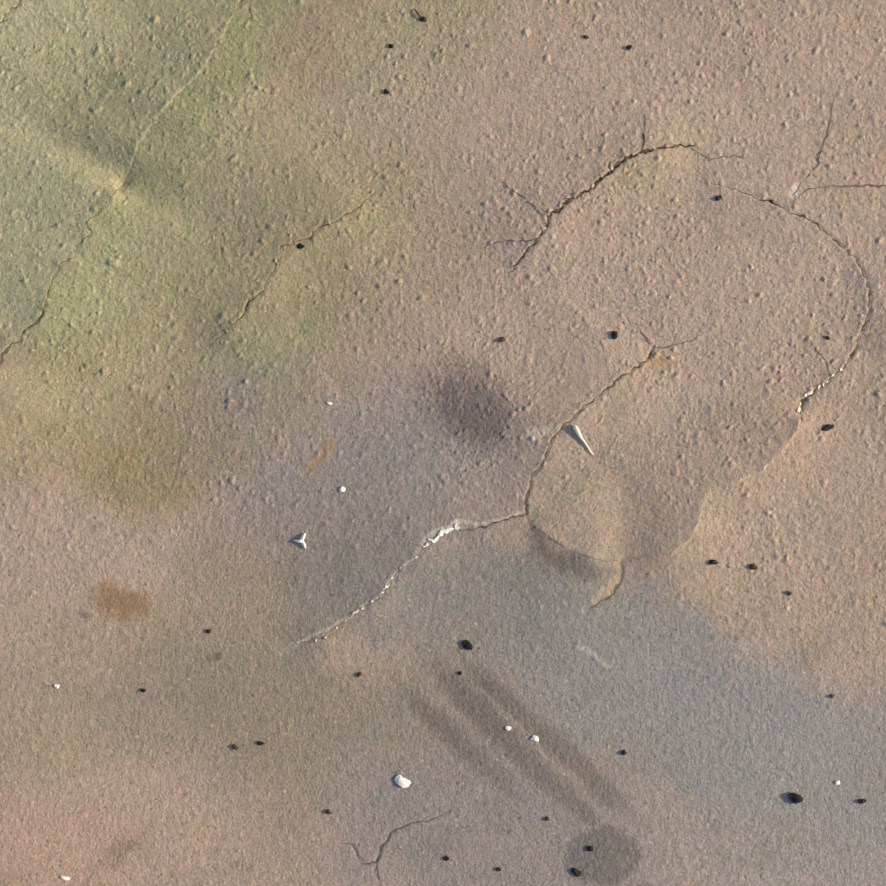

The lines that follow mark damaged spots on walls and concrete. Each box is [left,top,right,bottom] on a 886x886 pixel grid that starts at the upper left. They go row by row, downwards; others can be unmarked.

crack [0,184,119,362]
crack [210,191,375,347]
crack [483,95,886,423]
water stain [381,327,563,482]
crack [284,329,698,651]
rust [71,569,170,634]
water stain [276,509,525,660]
water stain [385,630,662,886]